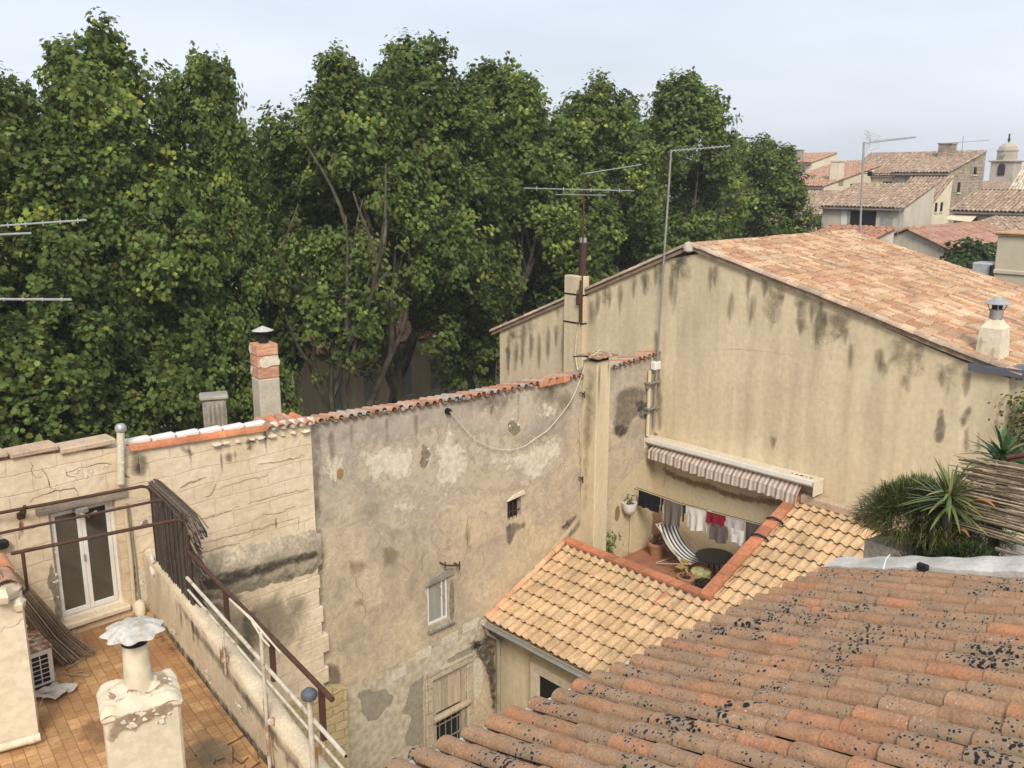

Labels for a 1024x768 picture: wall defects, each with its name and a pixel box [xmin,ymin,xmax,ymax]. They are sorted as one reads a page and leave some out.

water stain [615,379,660,436]
water stain [936,417,944,441]
crack [30,462,130,503]
peeling [320,418,563,521]
water stain [201,551,317,612]
water stain [471,637,496,708]
peeling [108,671,172,742]